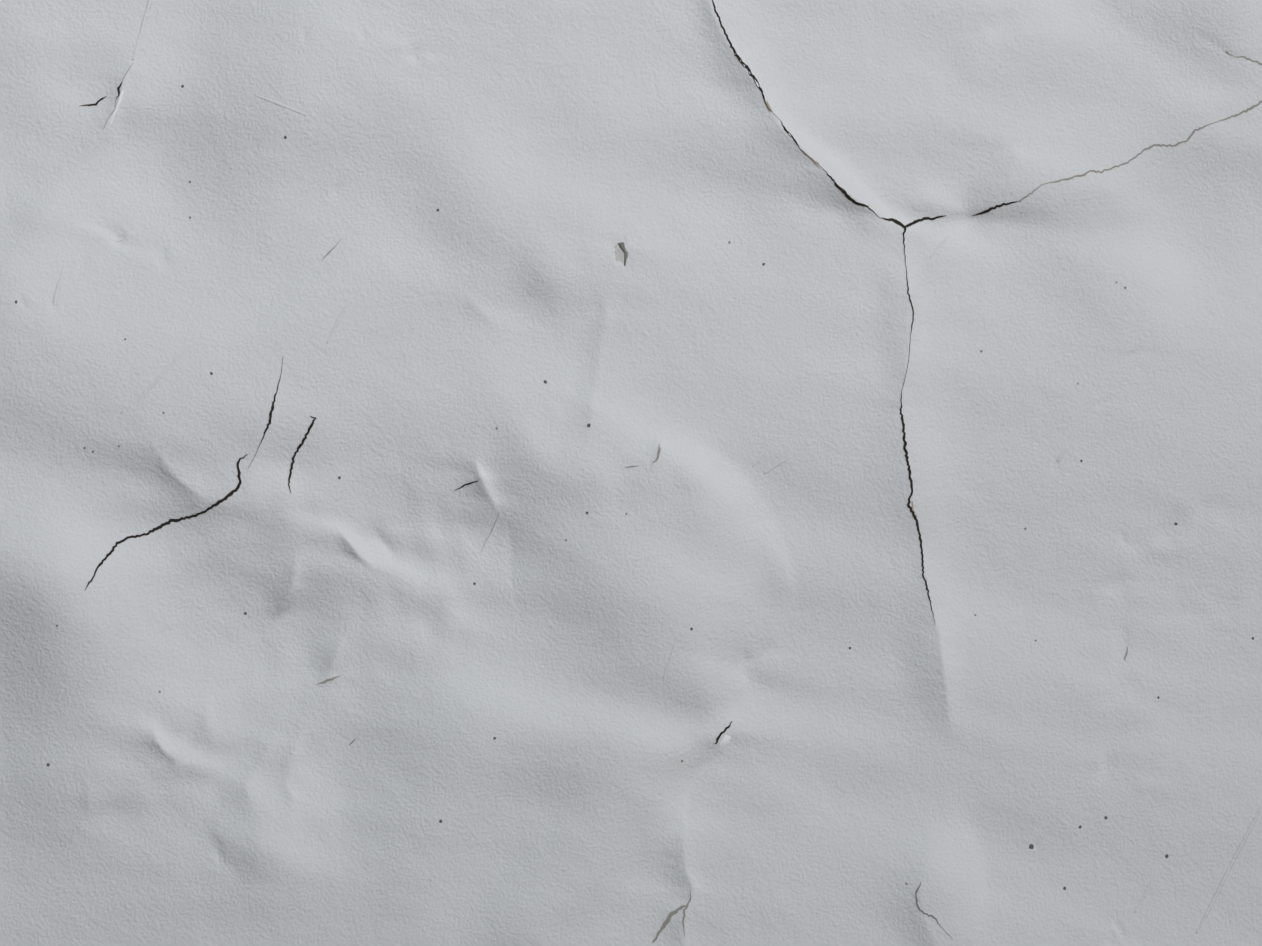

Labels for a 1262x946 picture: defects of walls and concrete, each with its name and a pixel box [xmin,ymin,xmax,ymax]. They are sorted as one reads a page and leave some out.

crack [712,0,1262,622]
crack [85,359,283,590]
crack [288,416,316,492]